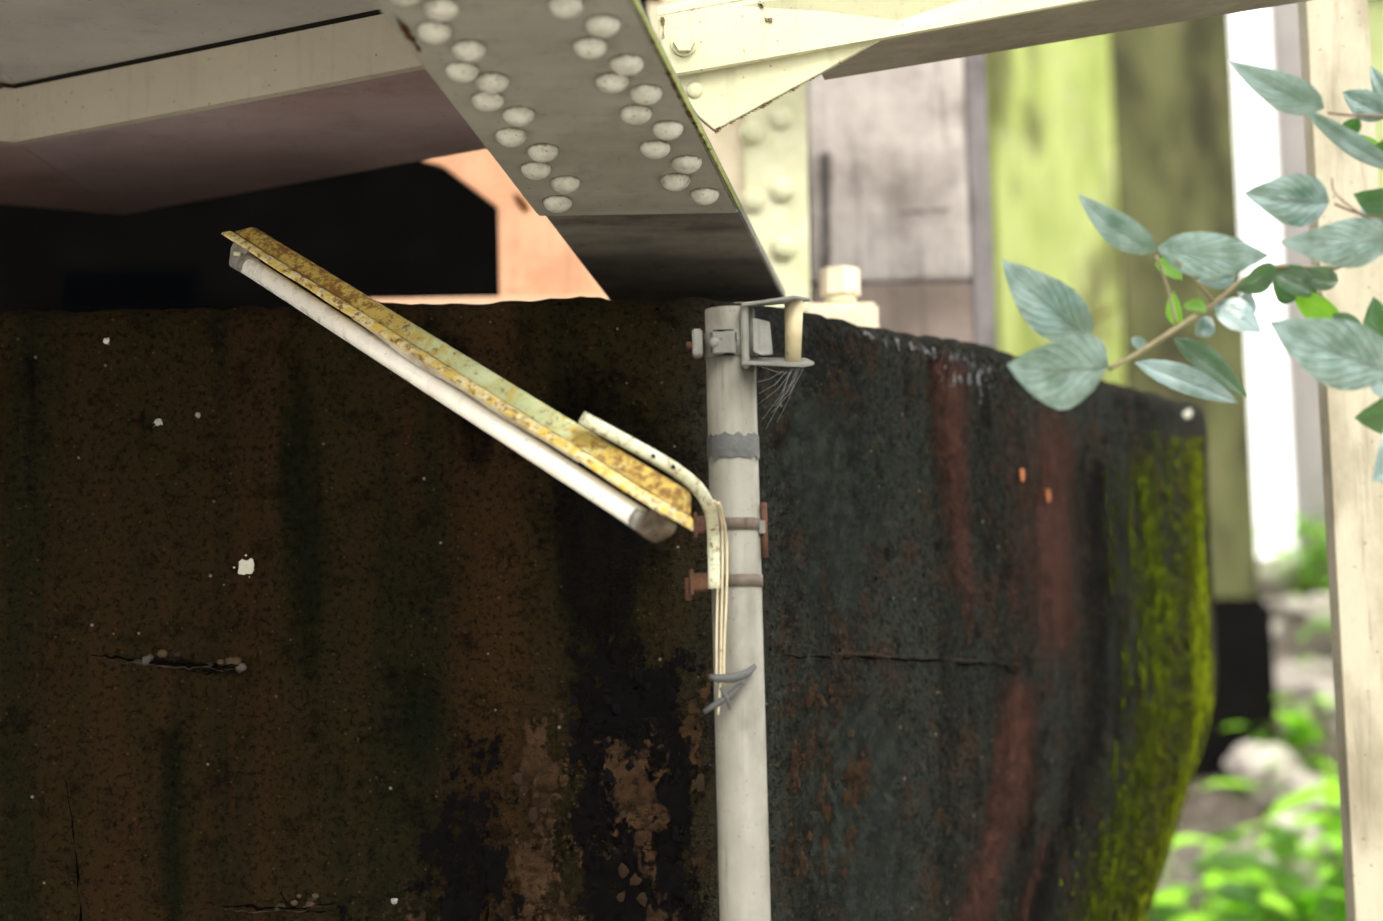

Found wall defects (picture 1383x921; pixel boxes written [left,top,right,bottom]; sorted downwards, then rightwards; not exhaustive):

rust [930,357,972,628]
rust [1031,414,1074,650]
crack [93,655,240,676]
crack [777,652,1032,676]